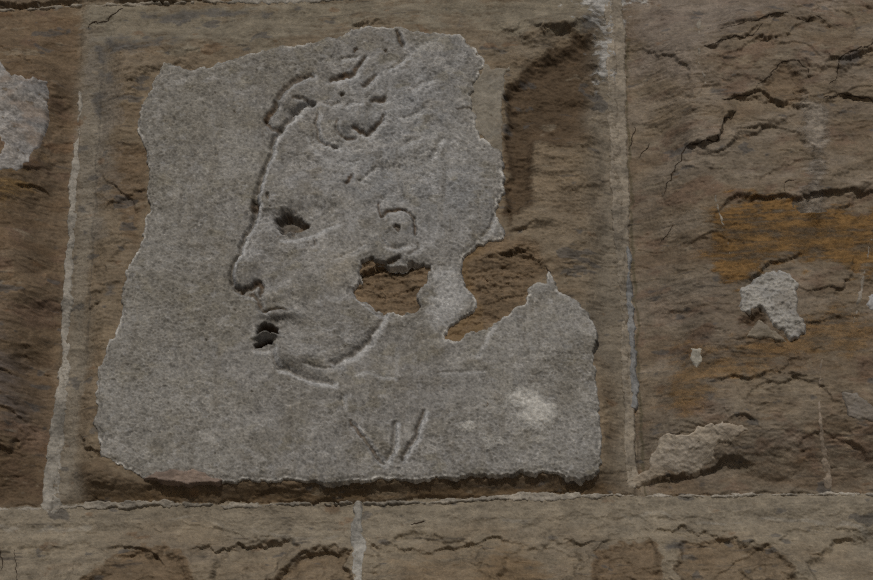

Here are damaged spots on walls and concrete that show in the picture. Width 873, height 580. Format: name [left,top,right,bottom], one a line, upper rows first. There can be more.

crack [704,12,842,47]
spalling [445,29,602,342]
crack [664,42,873,194]
spalling [353,259,431,316]